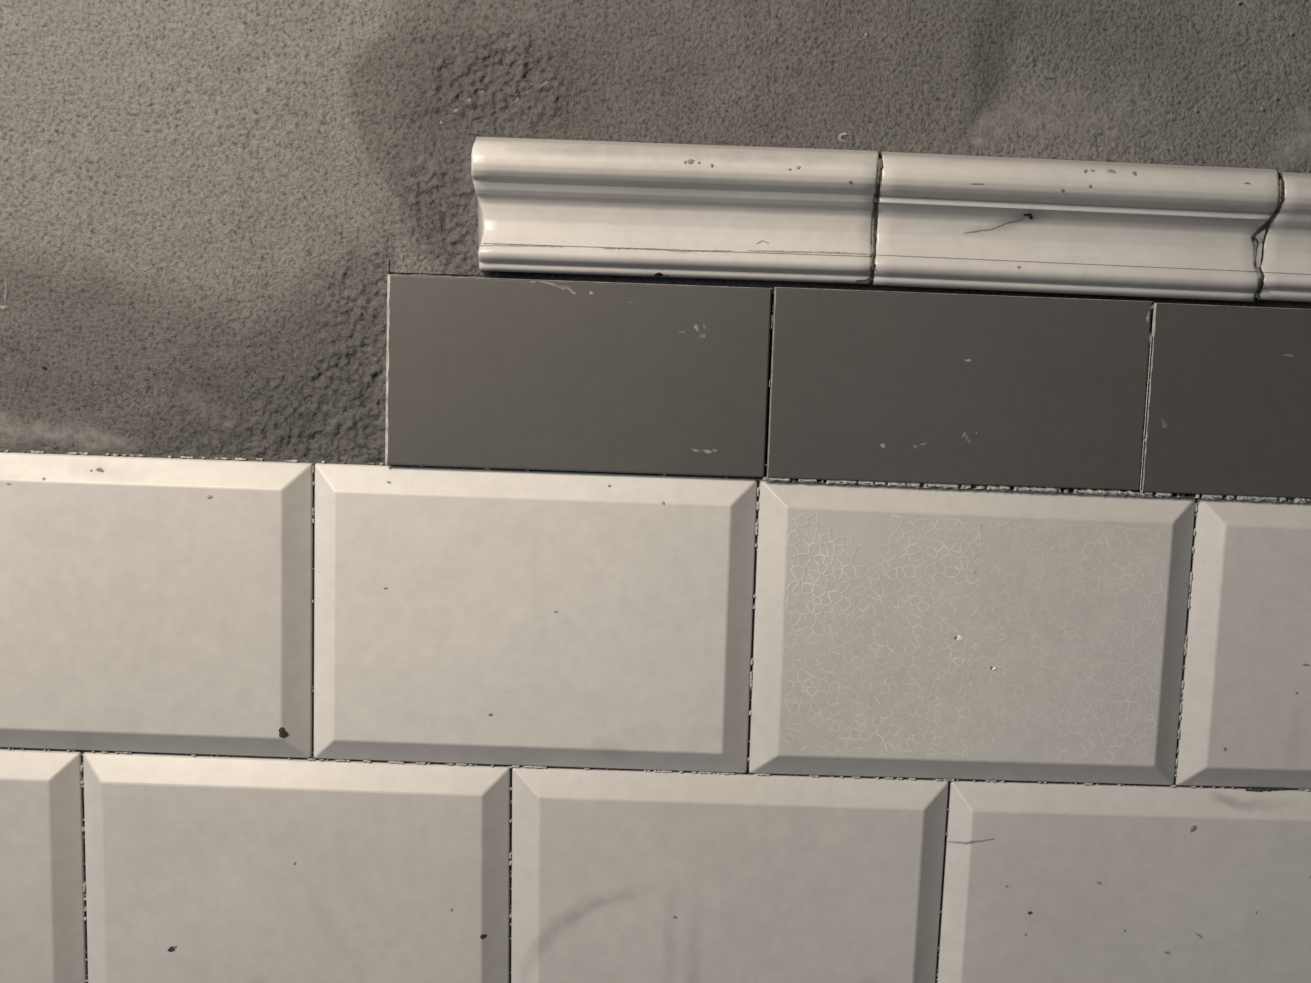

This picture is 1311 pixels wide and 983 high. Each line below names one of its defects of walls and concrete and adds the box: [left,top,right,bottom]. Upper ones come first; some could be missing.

crack [1253,178,1284,298]